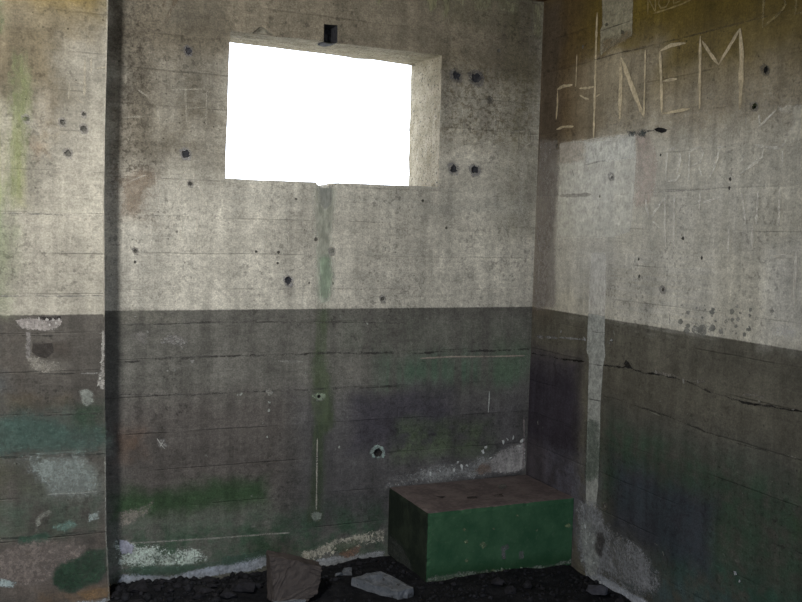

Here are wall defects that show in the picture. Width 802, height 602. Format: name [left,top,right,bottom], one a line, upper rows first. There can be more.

water stain [320,187,331,207]
water stain [320,257,331,297]
peeling [15,316,62,332]
crack [280,351,392,363]
crack [415,348,584,362]
crack [603,360,802,412]
water stain [115,540,268,585]